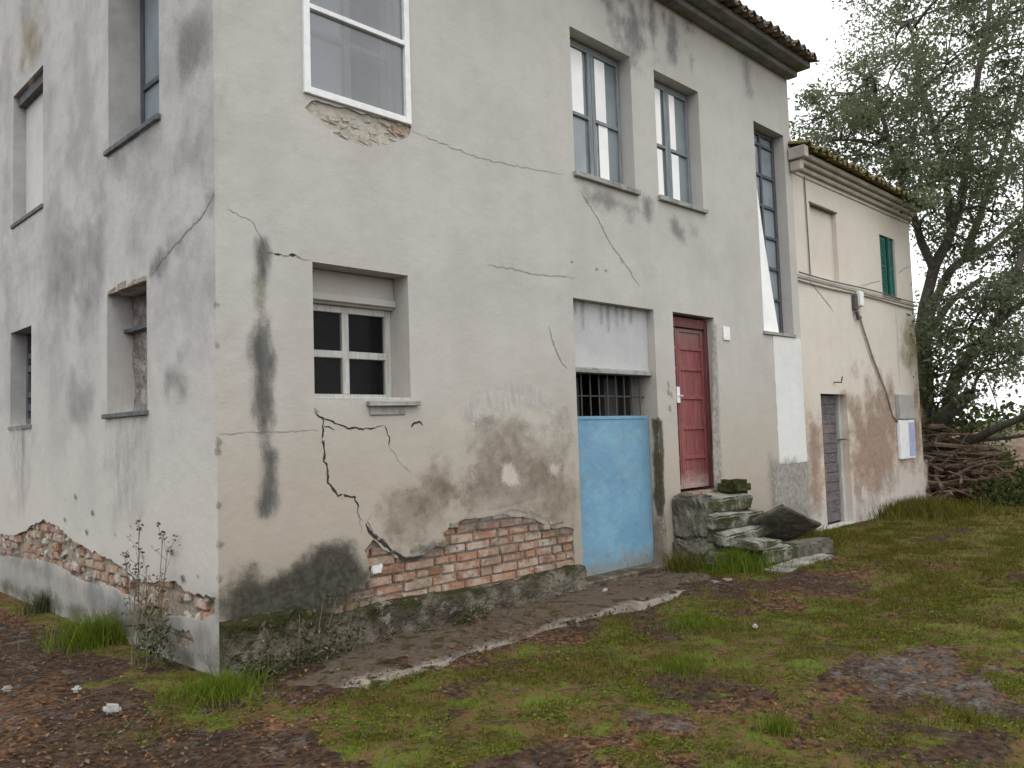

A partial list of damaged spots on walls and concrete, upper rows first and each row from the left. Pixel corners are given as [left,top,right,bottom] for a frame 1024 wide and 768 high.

flaking render [305,101,410,148]
crack [147,193,307,278]
leakage [258,239,269,279]
crack [413,131,640,287]
leakage [253,325,275,427]
leakage [260,441,277,515]
crack [223,408,433,561]
leakage [845,384,896,499]
flaking render [0,518,215,620]
leakage [215,543,370,621]
flaking render [331,514,583,614]